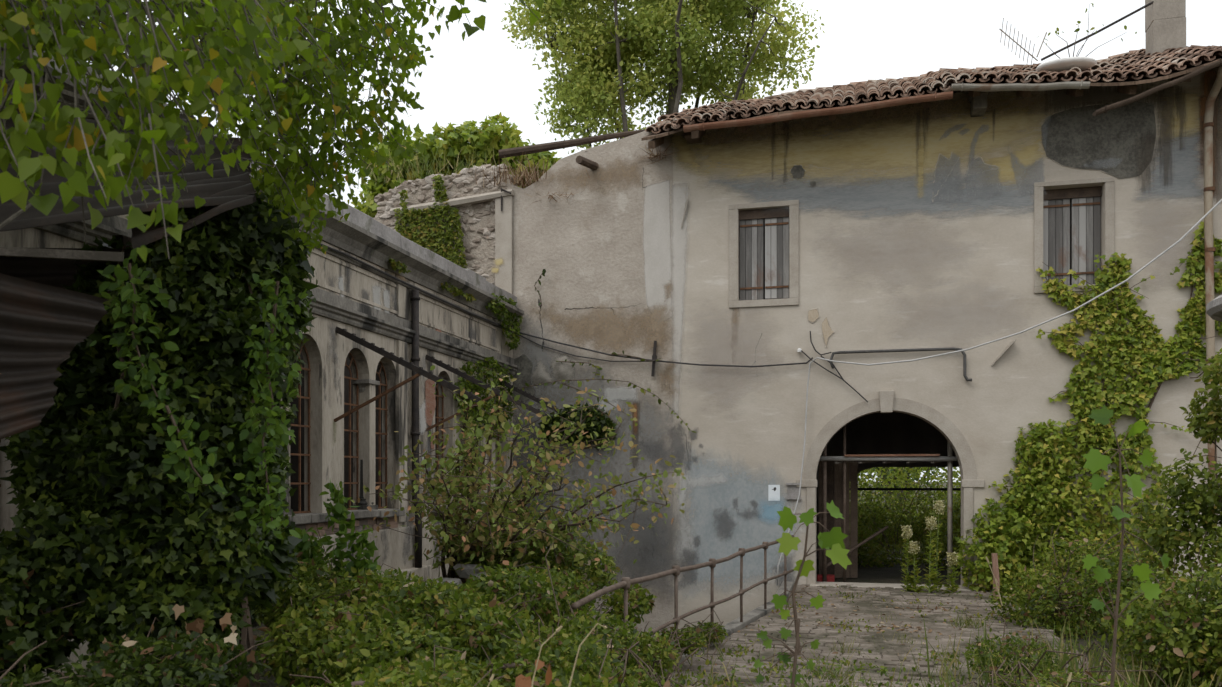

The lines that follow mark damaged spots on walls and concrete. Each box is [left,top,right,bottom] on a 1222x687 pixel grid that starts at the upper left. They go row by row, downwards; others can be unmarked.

peeling [691,94,1200,187]
damp [703,84,1203,217]
damp [515,337,794,588]